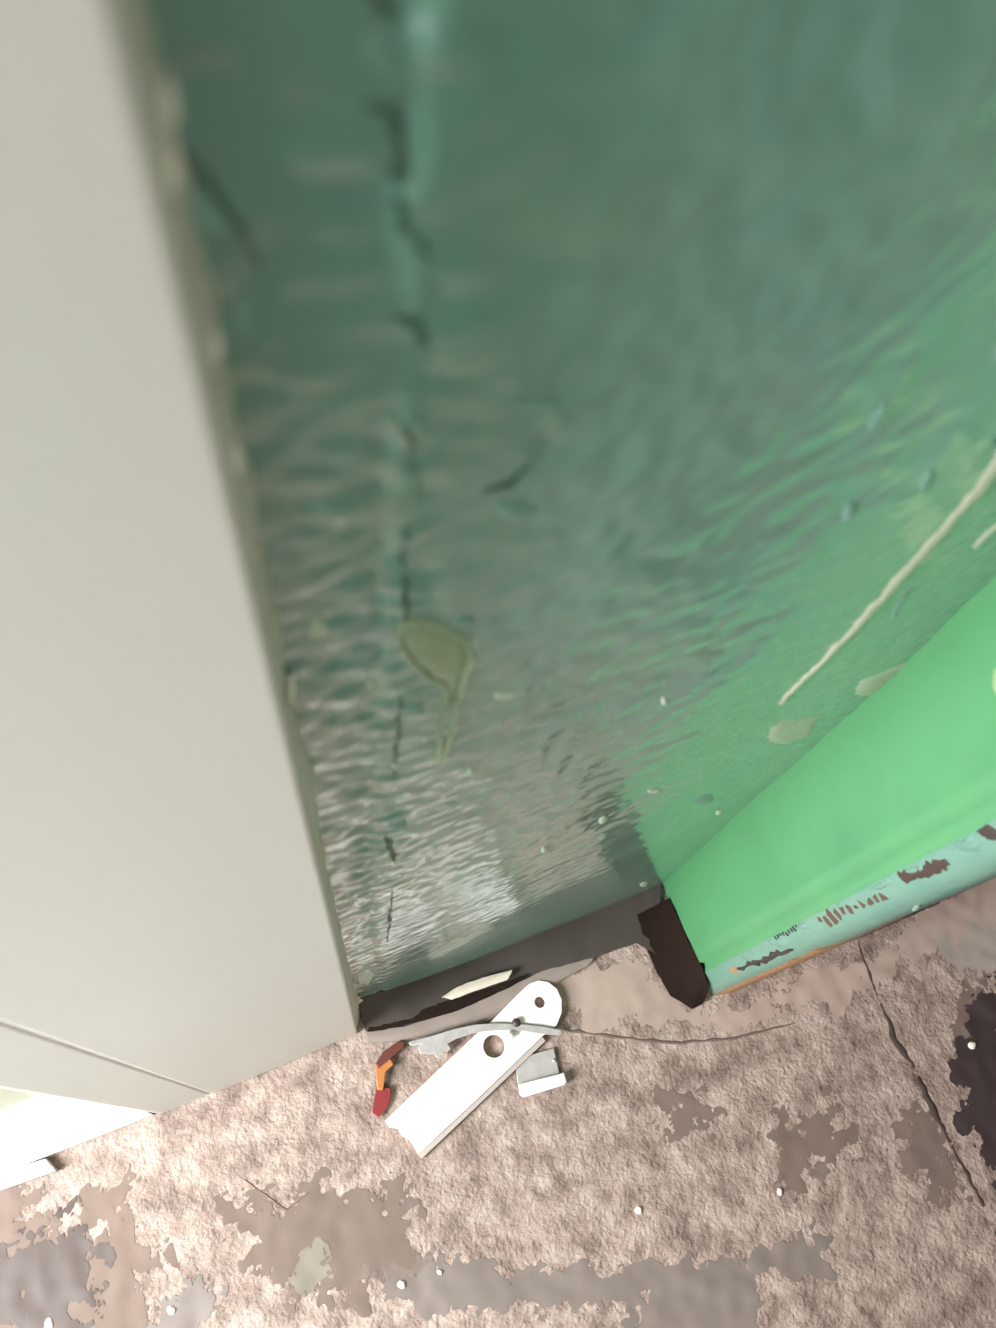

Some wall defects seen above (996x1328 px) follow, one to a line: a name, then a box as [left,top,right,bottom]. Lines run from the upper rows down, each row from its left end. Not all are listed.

crack [366,100,430,260]
crack [393,314,433,358]
crack [399,527,410,639]
crack [393,697,403,784]
crack [383,835,397,944]
spalling [366,958,593,1043]
hole [637,898,708,1009]
spalling [817,893,889,927]
spalling [897,859,951,883]
crack [858,943,996,1236]